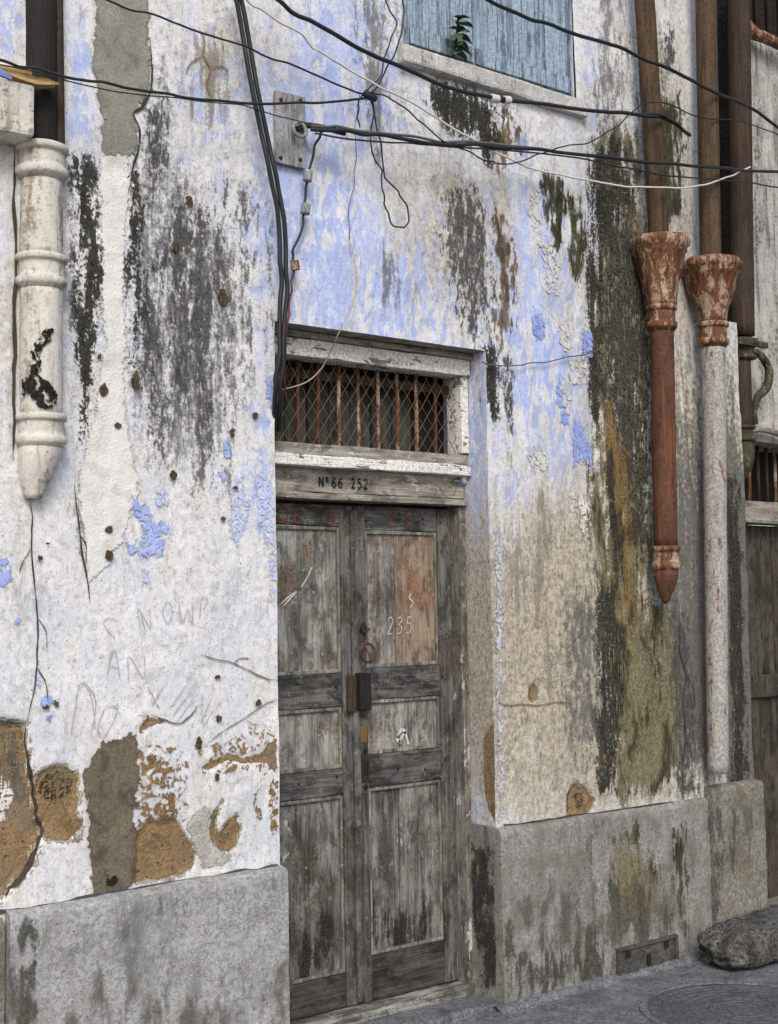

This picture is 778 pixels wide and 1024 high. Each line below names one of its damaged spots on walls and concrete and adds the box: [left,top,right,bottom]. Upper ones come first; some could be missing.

damp [423,77,526,175]
peeling [22,328,58,410]
mould [67,152,104,448]
damp [122,77,271,480]
damp [437,183,519,434]
peeling [556,320,594,468]
damp [503,0,701,808]
peeling [124,470,177,584]
crack [0,484,280,914]
spalling [0,714,85,907]
spalling [133,715,242,886]
damp [499,819,690,999]